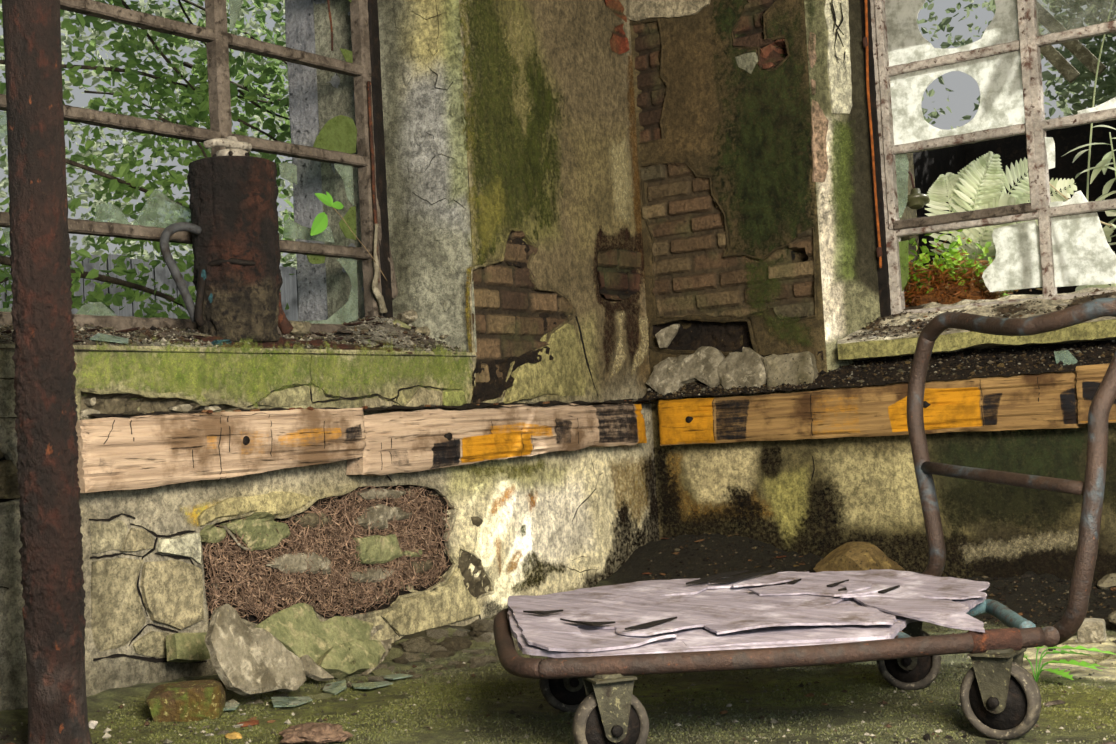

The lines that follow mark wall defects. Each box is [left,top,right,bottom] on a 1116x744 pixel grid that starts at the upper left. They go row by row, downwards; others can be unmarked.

water stain [460,0,563,268]
flaking render [602,0,710,145]
flaking render [731,0,790,74]
water stain [710,0,856,346]
crack [217,355,462,408]
flaking render [291,227,577,404]
flaking render [612,162,817,376]
crack [89,512,207,664]
flaking render [195,478,495,632]
water stain [513,551,565,592]
water stain [572,447,929,589]
water stain [934,427,1088,580]